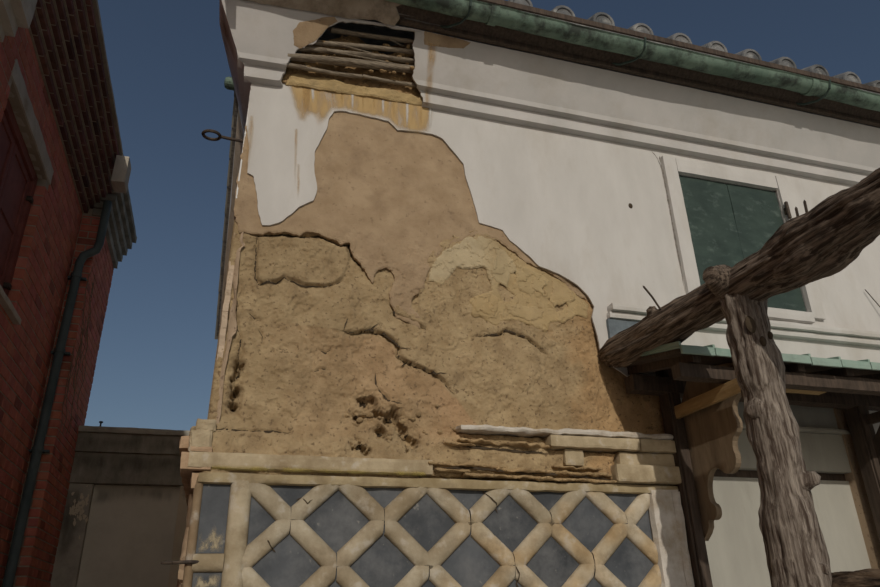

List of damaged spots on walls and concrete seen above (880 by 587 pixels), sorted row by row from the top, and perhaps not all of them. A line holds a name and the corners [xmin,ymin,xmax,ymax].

spalling [281,13,471,105]
crack [216,426,290,434]
crack [219,234,360,375]
crack [375,373,402,404]
crack [343,310,453,393]
flaking render [188,109,665,460]
crack [477,330,544,353]
flaking render [200,468,509,481]